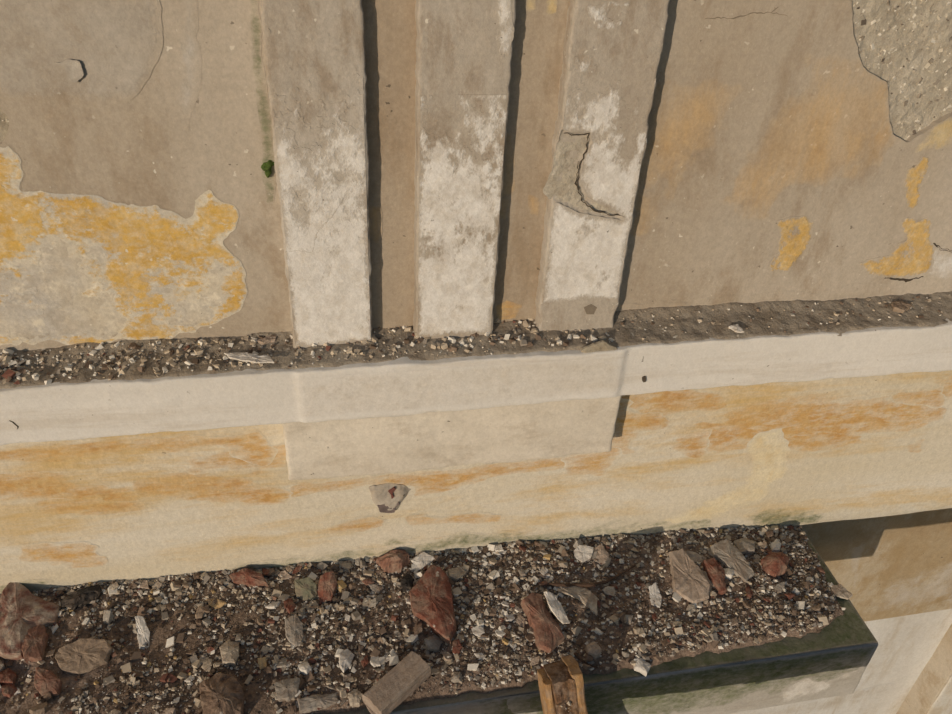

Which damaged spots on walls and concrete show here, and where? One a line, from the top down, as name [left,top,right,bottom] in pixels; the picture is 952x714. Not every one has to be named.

crack [705,7,787,19]
spalling [851,0,952,140]
peeling [0,107,248,347]
peeling [543,45,656,314]
peeling [768,216,814,272]
peeling [858,156,936,278]
damp [634,428,791,535]